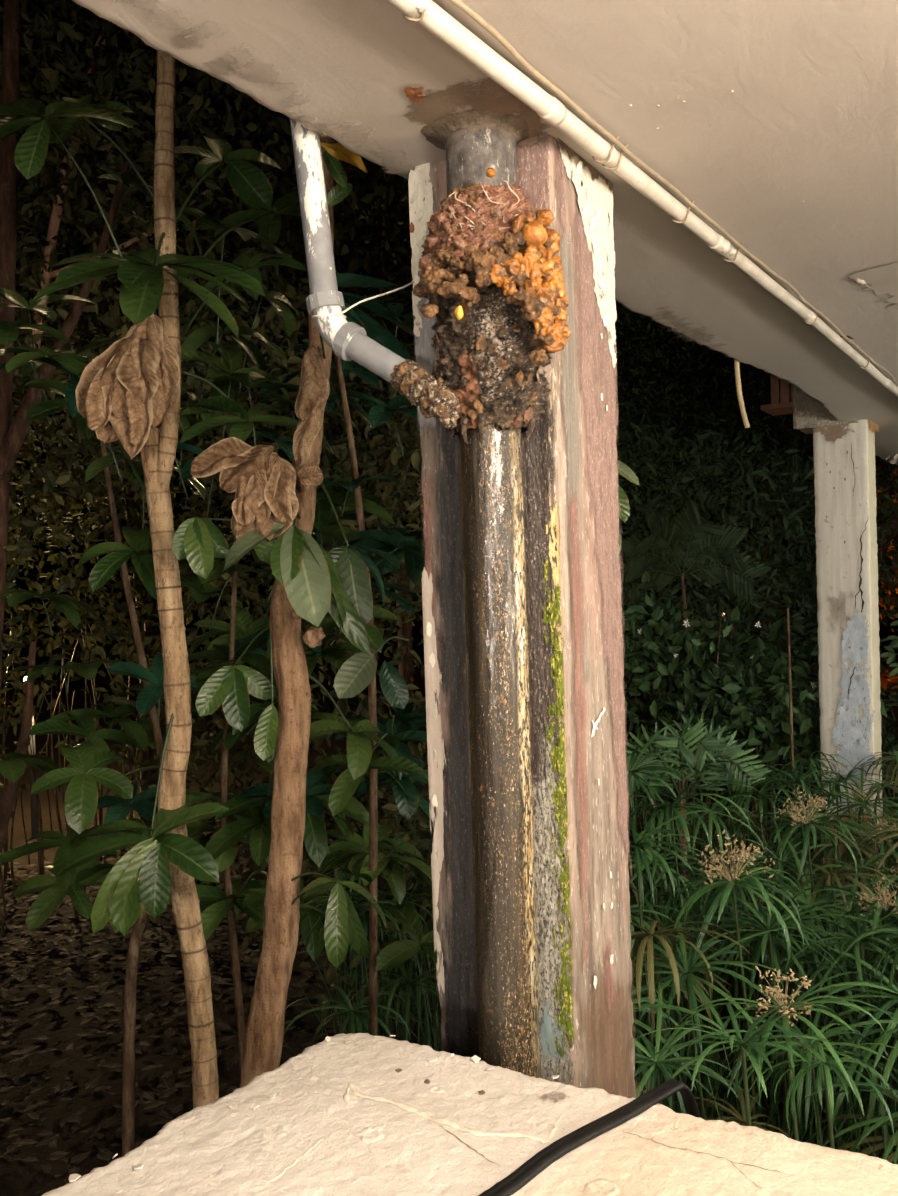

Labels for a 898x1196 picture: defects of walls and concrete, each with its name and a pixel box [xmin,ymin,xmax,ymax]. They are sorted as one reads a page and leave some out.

rust [404,87,424,104]
water stain [404,78,613,192]
peeling [849,262,898,309]
peeling [516,140,629,857]
crack [851,442,868,612]
water stain [521,235,589,1085]
crack [271,1137,324,1181]
crack [343,1083,561,1164]